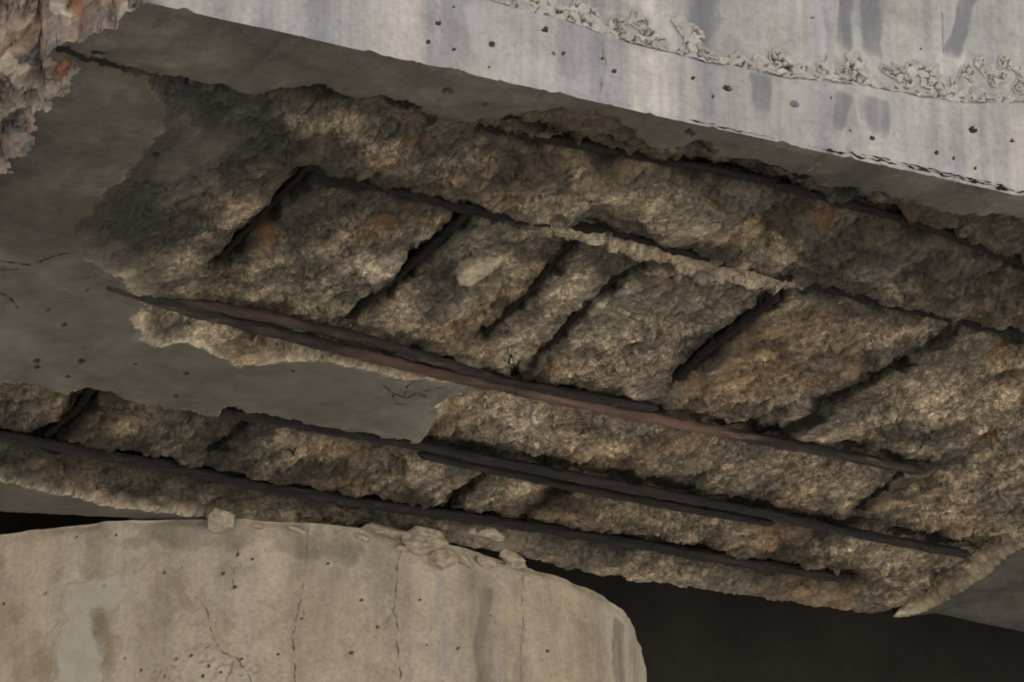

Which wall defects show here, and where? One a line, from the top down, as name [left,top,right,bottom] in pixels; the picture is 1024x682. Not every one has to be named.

leakage [841,0,878,47]
leakage [947,0,975,54]
spalling [0,0,148,174]
spalling [0,73,1024,617]
corrosion [492,341,550,383]
corrosion [858,356,914,386]
corrosion [711,390,847,443]
corrosion [430,476,572,521]
corrosion [522,449,906,526]
corrosion [888,527,975,546]
crack [291,527,309,682]
crack [190,599,252,682]